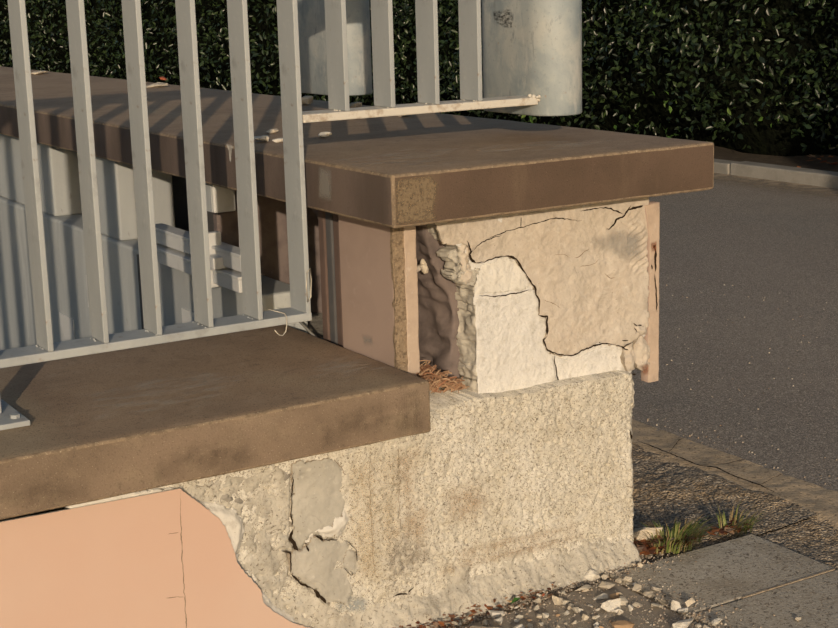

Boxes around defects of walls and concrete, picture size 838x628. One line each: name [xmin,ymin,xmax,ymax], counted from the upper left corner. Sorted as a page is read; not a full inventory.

spalling [436,243,650,393]
crack [467,205,643,380]
crack [650,245,658,310]
spalling [186,458,361,628]